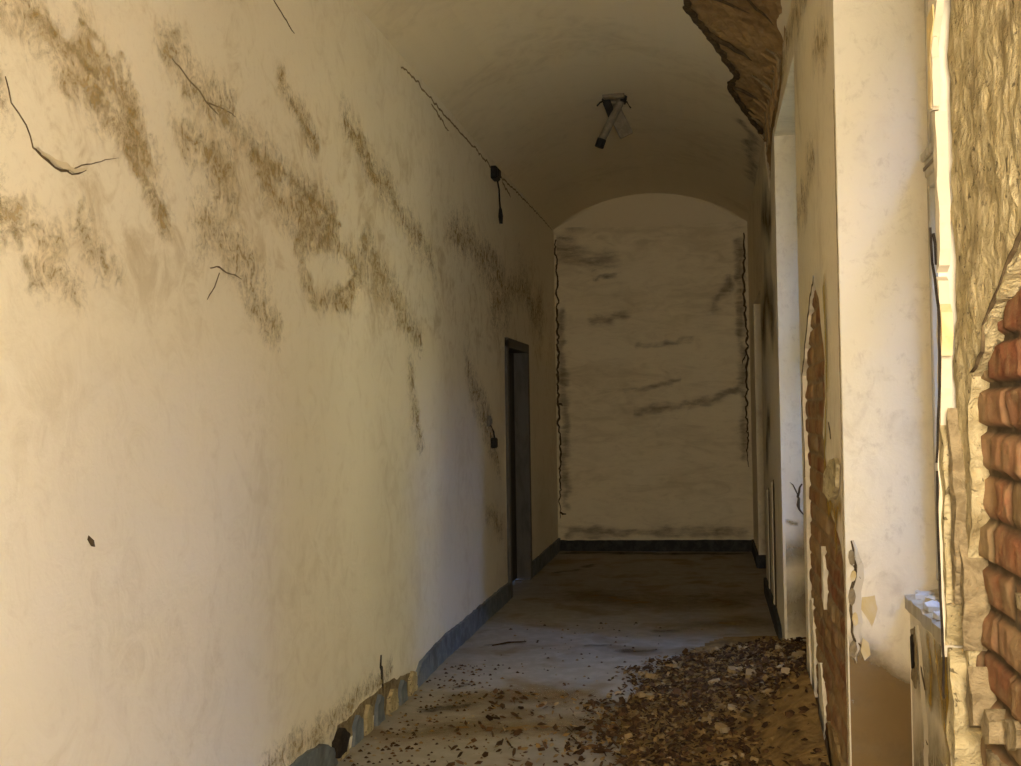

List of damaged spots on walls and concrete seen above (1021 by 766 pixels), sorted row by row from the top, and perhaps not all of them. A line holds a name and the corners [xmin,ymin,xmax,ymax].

crack [5,76,116,175]
leakage [19,4,152,176]
crack [207,266,241,300]
leakage [181,124,278,333]
leakage [243,134,422,346]
leakage [344,116,433,267]
spalling [683,0,764,135]
flaking render [927,0,1021,766]
flaking render [805,290,878,766]
flaking render [910,626,918,689]